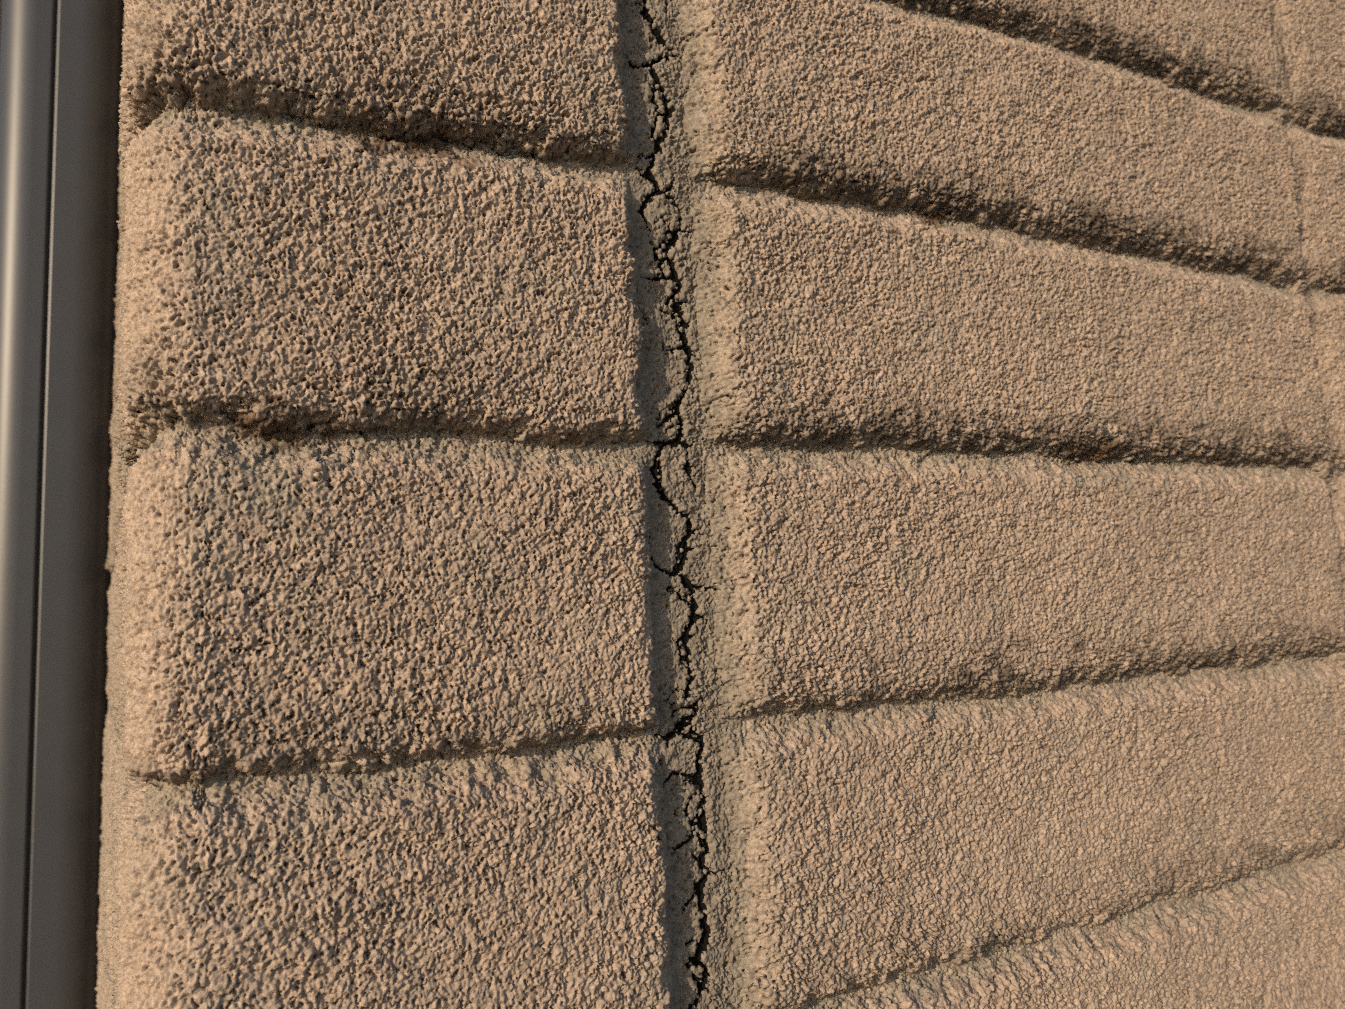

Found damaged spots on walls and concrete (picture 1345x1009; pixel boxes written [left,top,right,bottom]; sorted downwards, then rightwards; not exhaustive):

crack [626,0,724,1009]